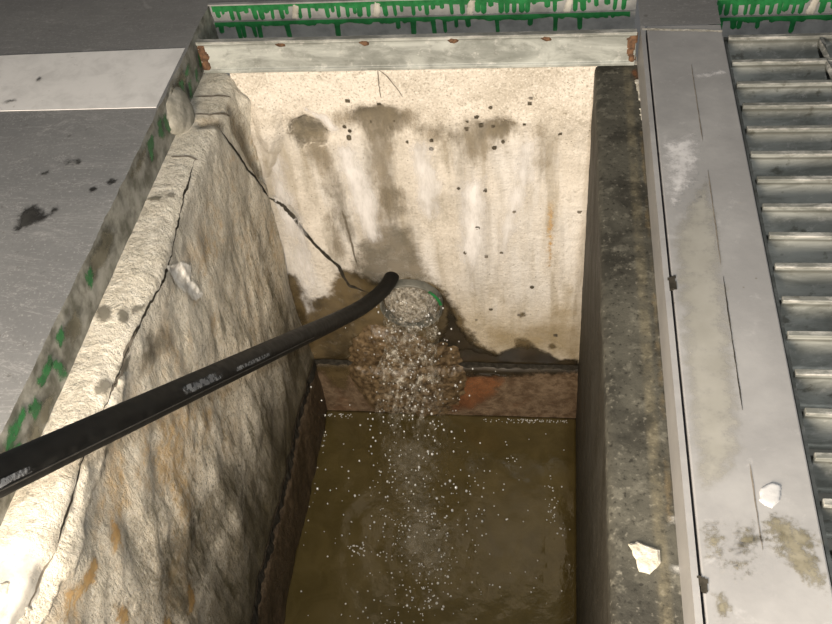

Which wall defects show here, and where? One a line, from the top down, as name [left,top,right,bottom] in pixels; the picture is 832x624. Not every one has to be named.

leakage [337,107,396,123]
crack [195,95,369,293]
crack [103,155,198,410]
leakage [273,131,578,417]
crack [24,457,84,616]
leakage [737,514,825,585]
rust [66,558,98,614]
rust [116,607,128,624]
leakage [717,594,732,617]